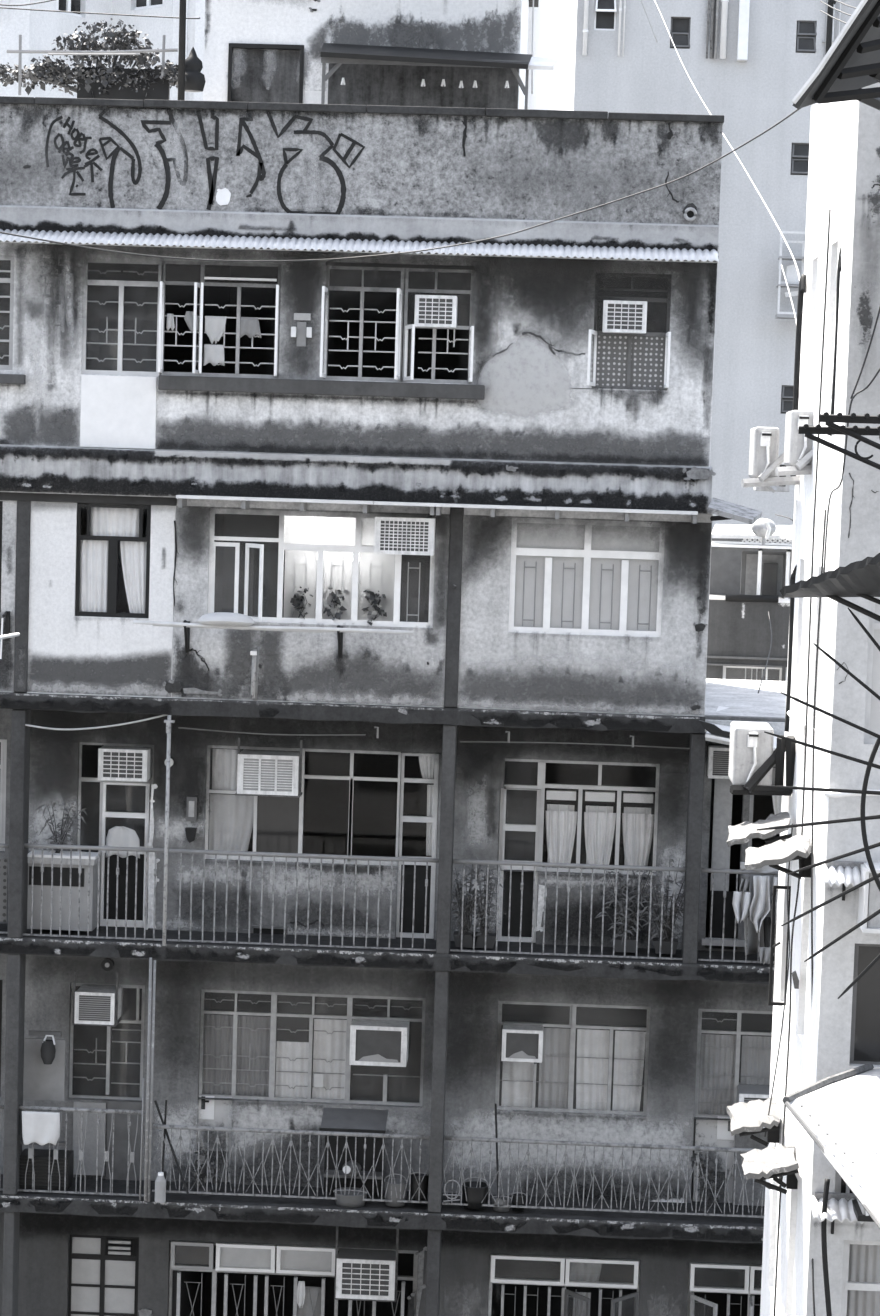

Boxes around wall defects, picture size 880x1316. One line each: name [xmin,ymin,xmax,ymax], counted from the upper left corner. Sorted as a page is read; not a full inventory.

leakage [298,10,519,79]
leakage [393,114,510,134]
leakage [528,118,619,158]
leakage [657,124,669,156]
leakage [685,123,718,143]
leakage [19,247,77,362]
crack [493,332,585,357]
leakage [703,349,712,394]
leakage [251,394,472,406]
leakage [0,408,710,514]
leakage [461,667,703,723]